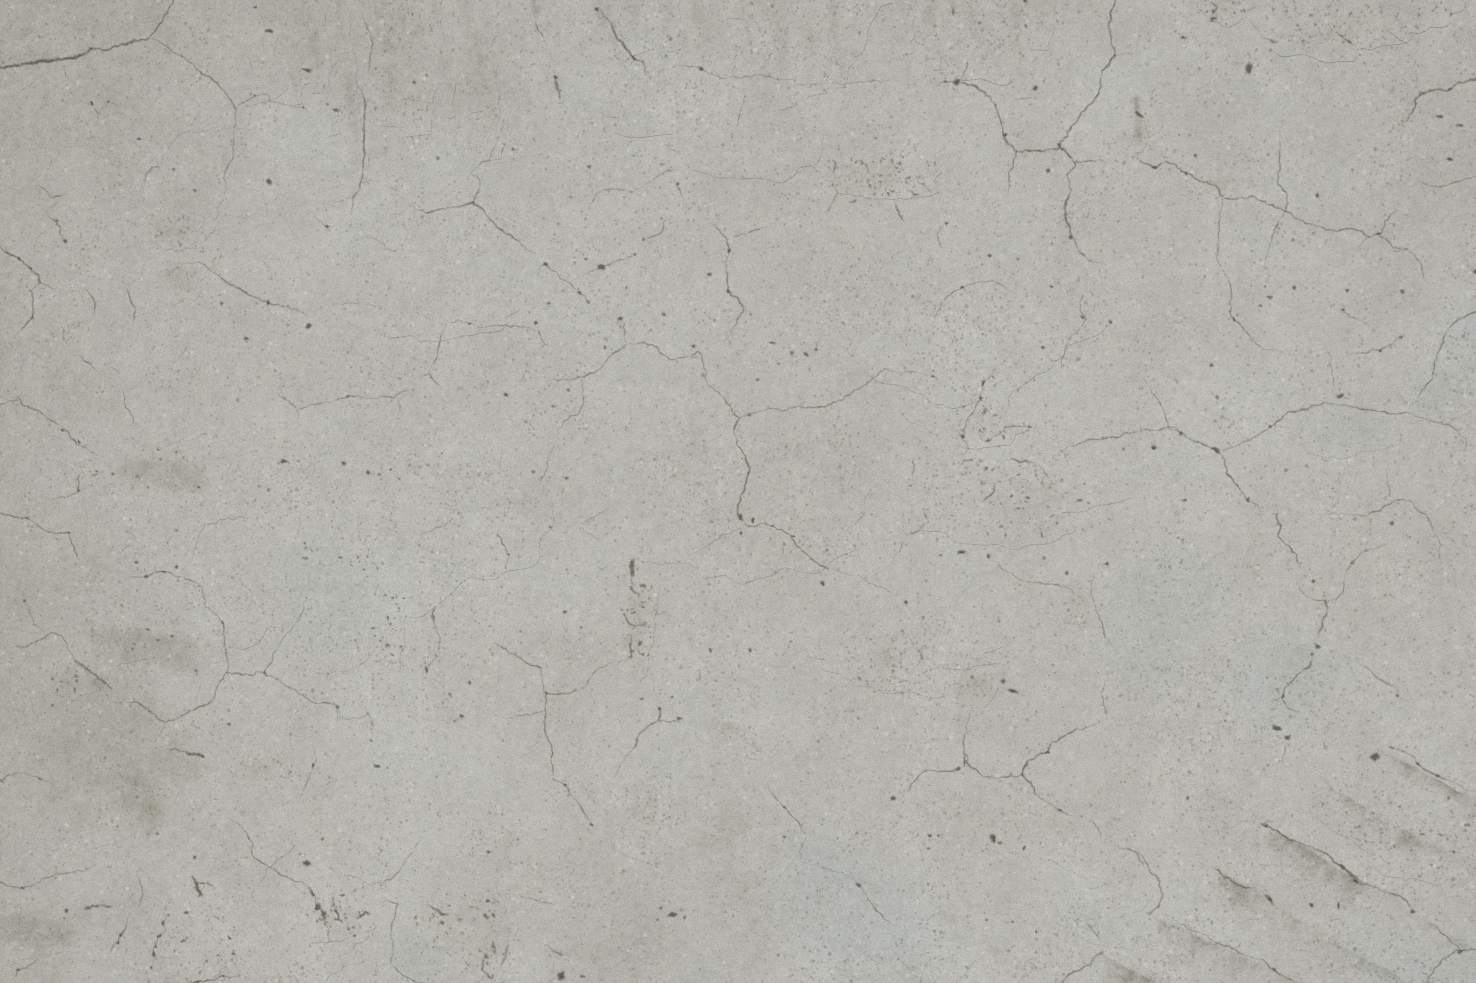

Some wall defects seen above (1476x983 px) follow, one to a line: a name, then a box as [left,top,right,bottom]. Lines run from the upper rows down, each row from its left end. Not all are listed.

crack [0,0,174,68]
crack [944,0,1116,261]
crack [1412,78,1476,113]
crack [2,249,40,328]
crack [725,400,825,567]
crack [1159,416,1297,556]
crack [140,608,339,757]
crack [1273,553,1361,740]
crack [891,732,1072,811]
crack [1262,824,1357,883]
crack [85,895,169,968]